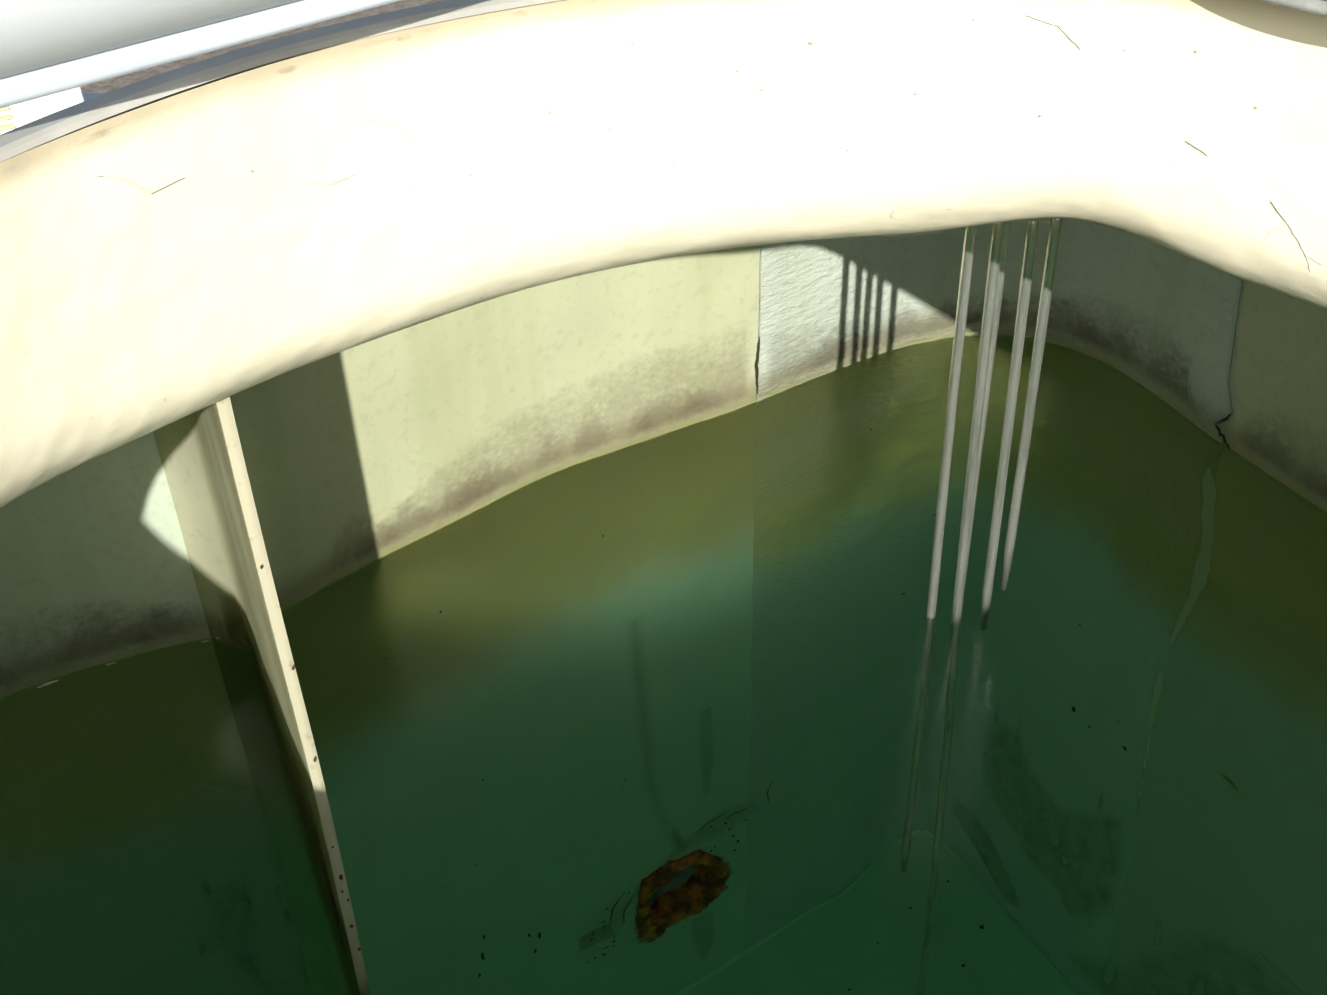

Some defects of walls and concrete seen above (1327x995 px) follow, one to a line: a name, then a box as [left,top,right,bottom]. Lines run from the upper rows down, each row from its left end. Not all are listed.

crack [1261,201,1327,270]
crack [754,245,762,405]
crack [1214,280,1243,450]